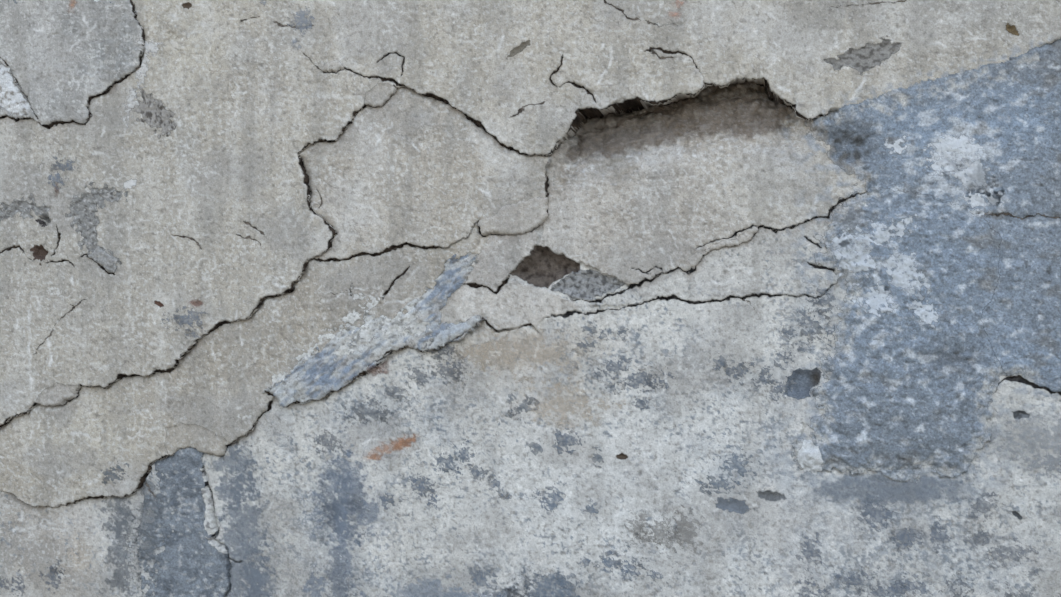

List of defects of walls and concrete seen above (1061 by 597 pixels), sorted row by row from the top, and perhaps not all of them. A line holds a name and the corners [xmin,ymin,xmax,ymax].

peeling [0,0,144,125]
spalling [824,36,902,75]
spalling [128,88,177,139]
crack [0,0,866,450]
spalling [510,81,865,301]
crack [972,211,1060,219]
spalling [0,223,489,509]
crack [998,375,1061,395]
crack [19,453,175,507]
peeling [200,468,228,554]
peeling [0,570,25,597]
peeling [39,560,66,594]